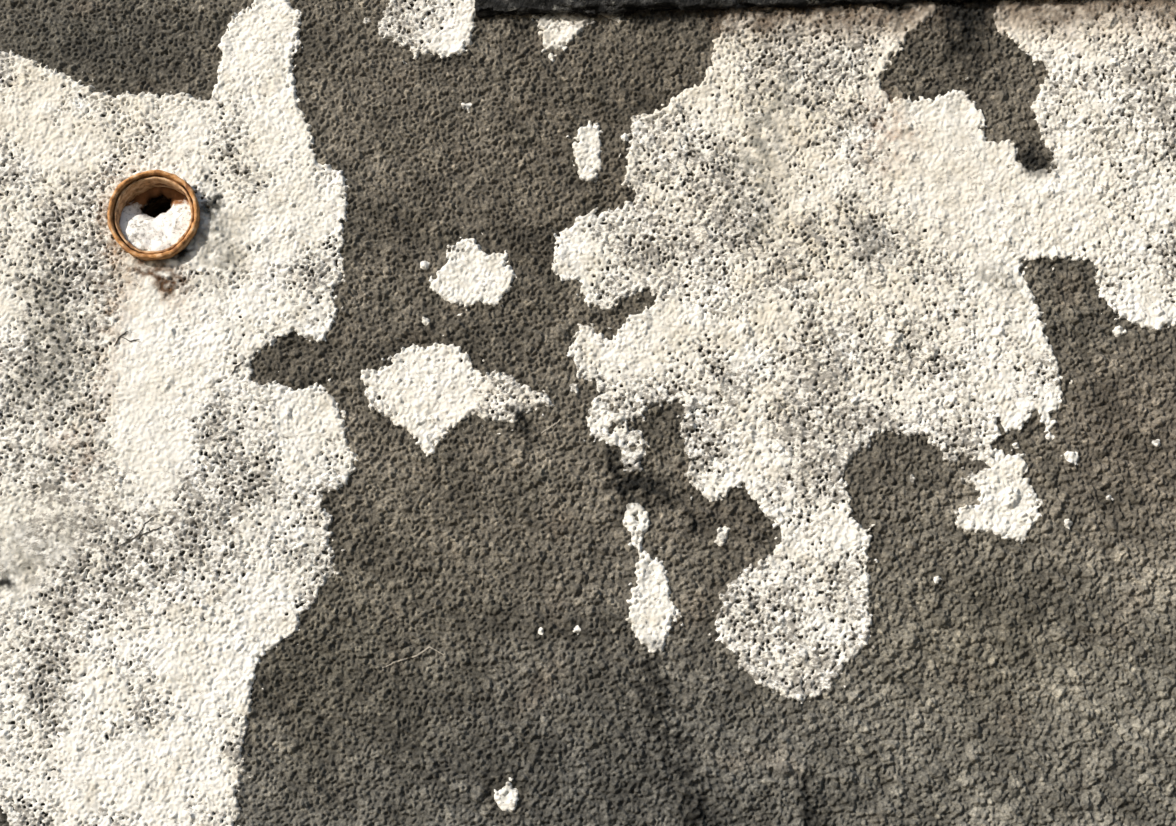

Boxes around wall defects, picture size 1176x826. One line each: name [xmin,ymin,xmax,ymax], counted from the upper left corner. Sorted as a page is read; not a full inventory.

peeling [363,0,475,64]
peeling [531,12,621,62]
peeling [420,232,517,316]
peeling [0,0,358,826]
peeling [360,335,555,456]
peeling [551,0,1176,704]